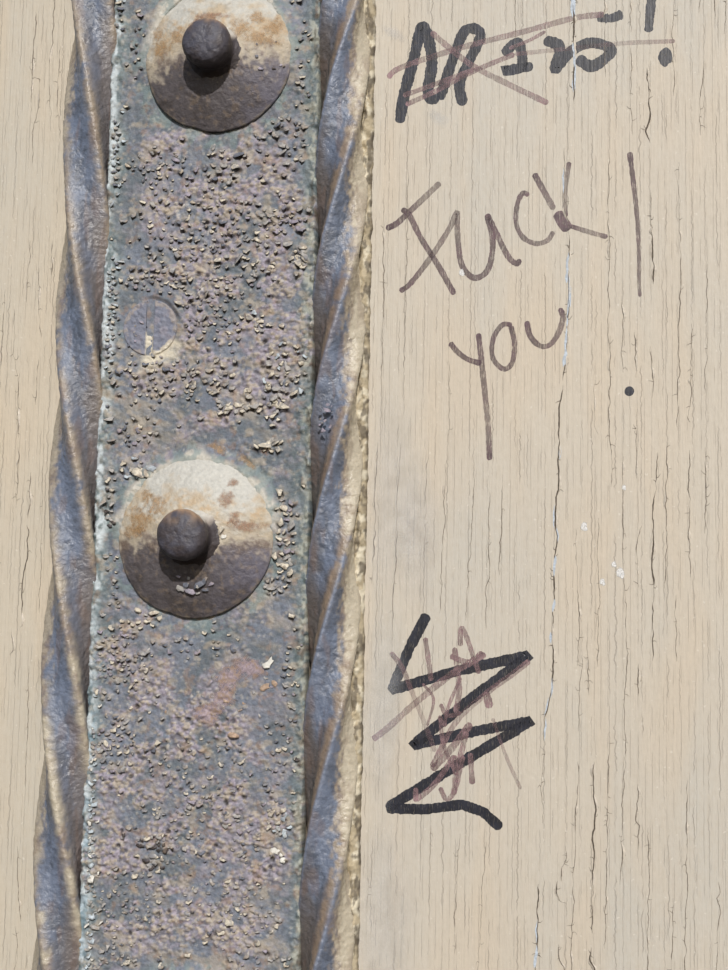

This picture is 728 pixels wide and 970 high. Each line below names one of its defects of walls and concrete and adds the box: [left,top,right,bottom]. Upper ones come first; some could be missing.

crack [569,0,577,99]
crack [604,0,726,141]
crack [381,173,409,414]
rust [222,481,253,530]
crack [371,444,401,639]
crack [423,457,446,610]
crack [466,479,502,622]
crack [533,159,711,970]
crack [453,840,486,964]